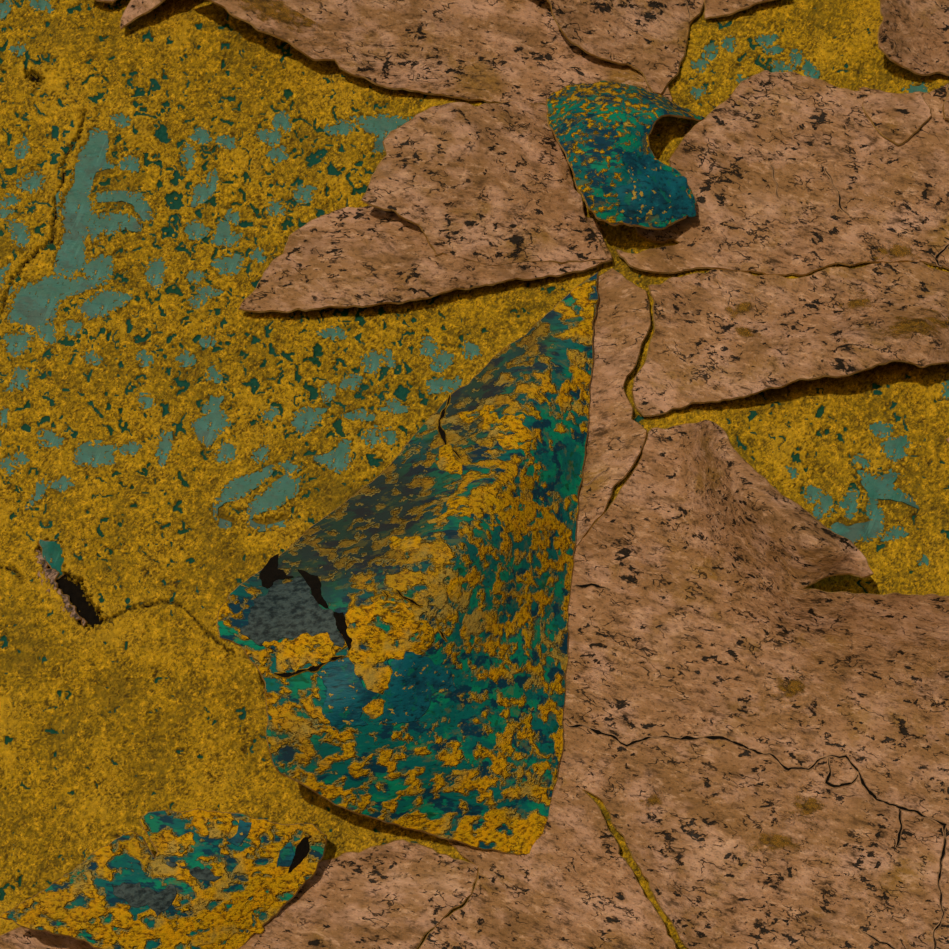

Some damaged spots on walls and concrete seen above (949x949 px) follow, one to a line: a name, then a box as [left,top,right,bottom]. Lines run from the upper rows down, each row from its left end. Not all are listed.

peeling [120,0,165,30]
peeling [180,127,236,171]
crack [3,114,85,312]
peeling [0,113,154,392]
peeling [25,476,75,510]
peeling [72,440,142,468]
peeling [191,395,237,463]
peeling [213,444,302,532]
peeling [239,0,949,949]
spalling [35,539,102,628]
crack [565,723,947,949]
peeling [0,927,96,949]